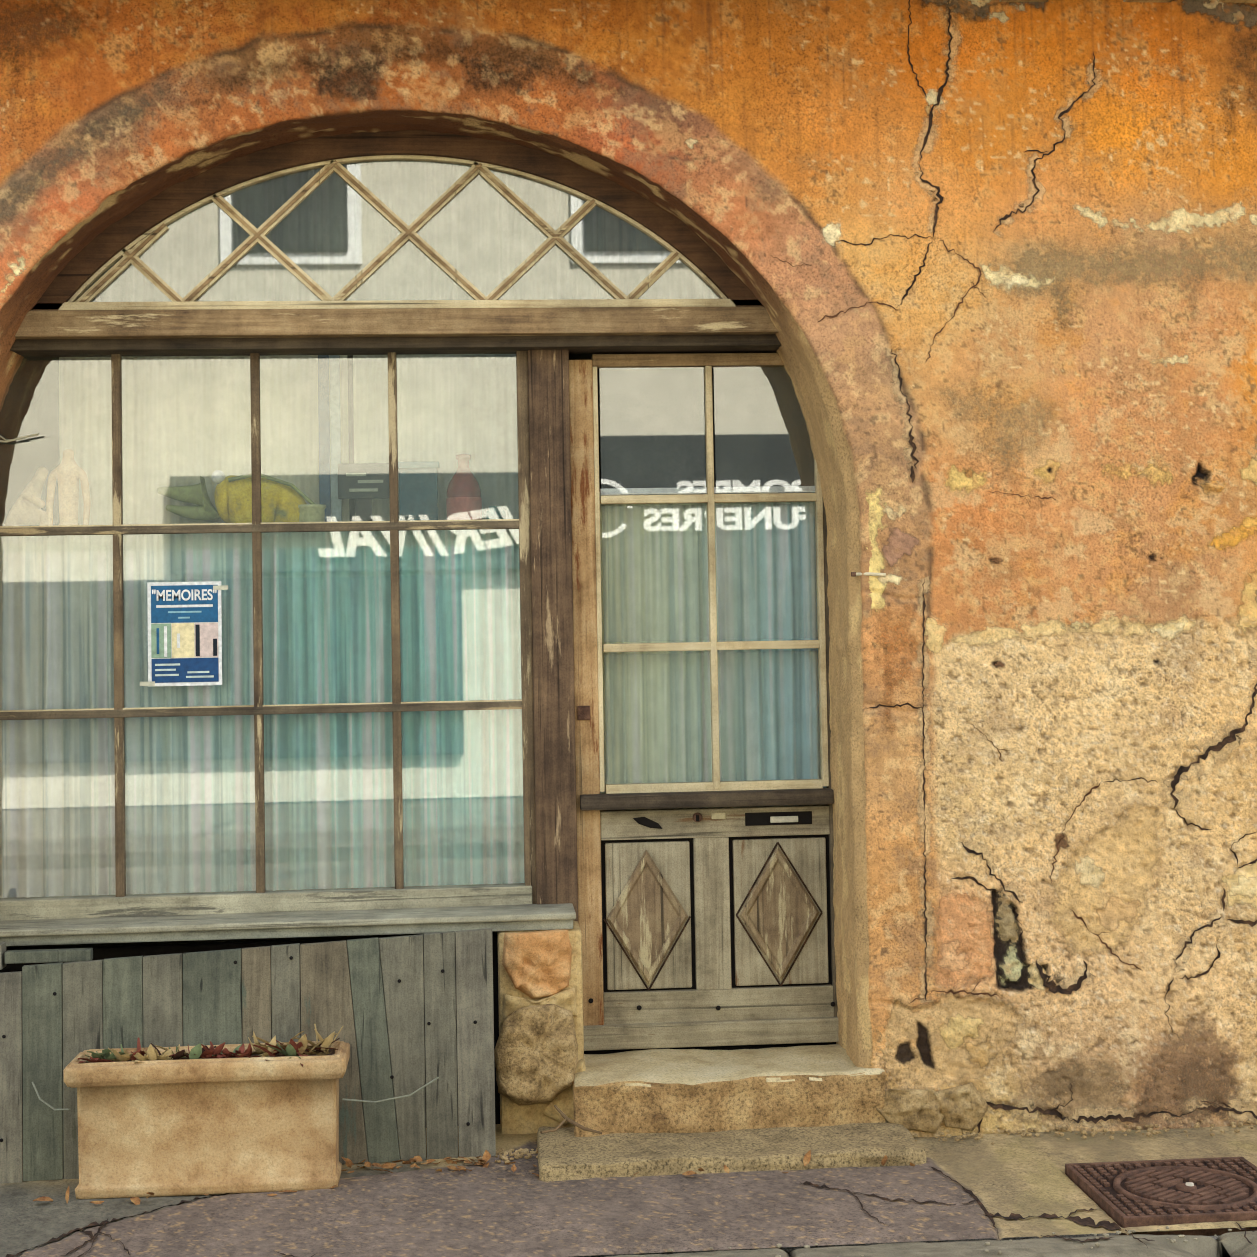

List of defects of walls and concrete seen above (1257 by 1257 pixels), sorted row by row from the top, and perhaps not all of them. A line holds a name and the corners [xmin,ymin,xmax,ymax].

water stain [313,61,382,99]
water stain [466,66,528,90]
crack [993,51,1103,237]
crack [818,0,989,483]
crack [988,491,1058,506]
spalling [1192,463,1226,494]
peeling [924,615,1196,653]
crack [867,576,1257,1038]
spalling [1051,801,1166,954]
spalling [877,890,1048,1090]
water stain [1011,1060,1127,1129]
water stain [1134,1020,1242,1125]